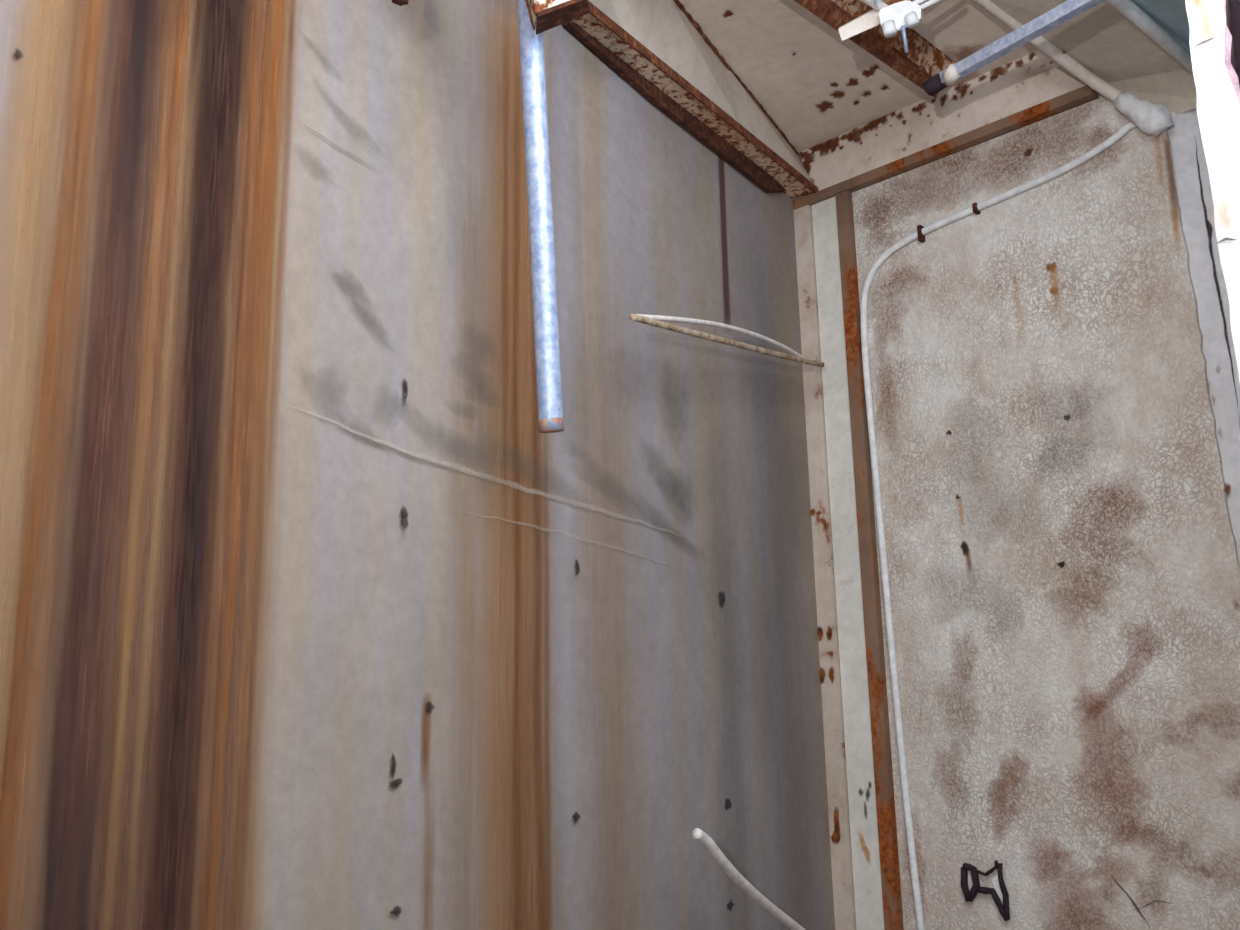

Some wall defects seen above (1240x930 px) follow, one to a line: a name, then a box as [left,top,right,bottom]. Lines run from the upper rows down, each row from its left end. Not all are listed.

corrosion [799,53,1035,182]
corrosion [0,0,293,930]
corrosion [817,626,832,641]
corrosion [820,667,834,683]
corrosion [831,808,840,843]